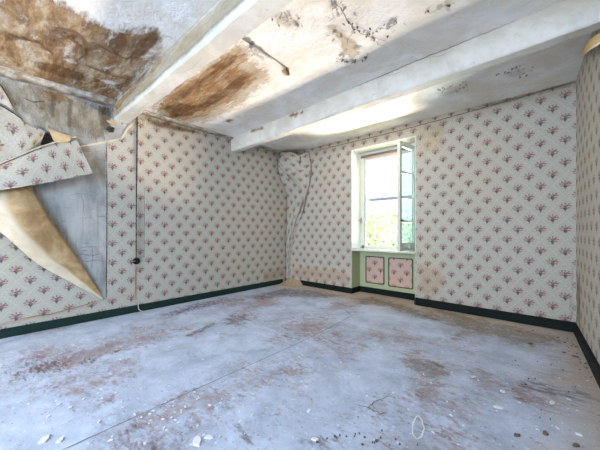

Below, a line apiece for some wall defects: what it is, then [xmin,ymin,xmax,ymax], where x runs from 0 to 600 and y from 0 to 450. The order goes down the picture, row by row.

leakage [0,0,242,145]
leakage [152,46,267,133]
peeling [327,26,367,63]
flaking render [0,76,134,300]